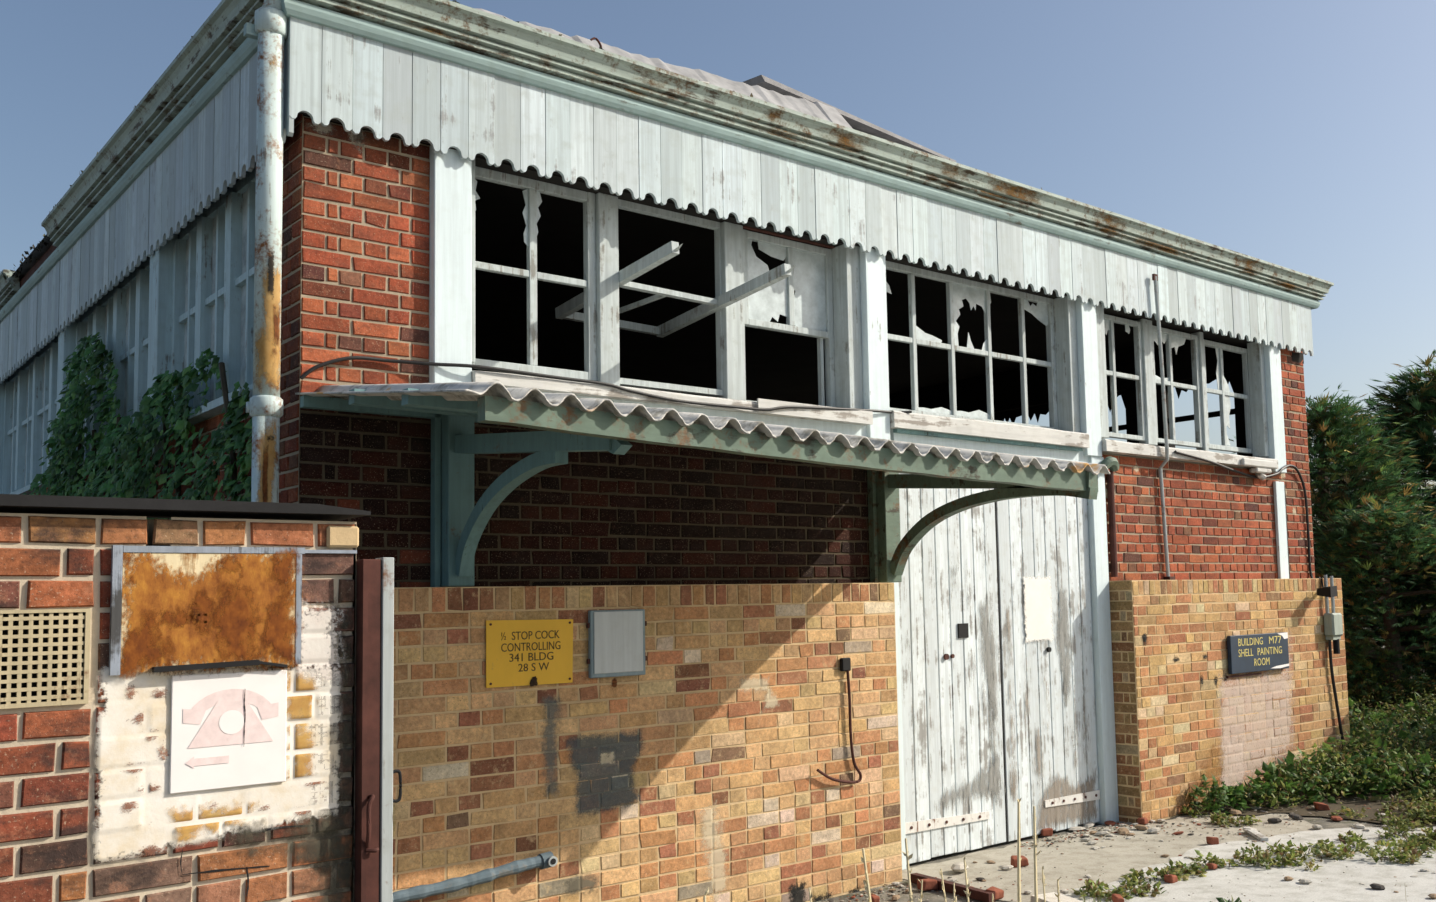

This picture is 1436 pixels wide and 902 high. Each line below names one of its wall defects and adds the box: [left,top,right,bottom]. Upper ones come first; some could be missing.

rust [255,251,281,389]
rust [257,422,276,502]
rust [120,550,303,677]
peeling [95,602,343,861]
damp [542,697,559,794]
peeling [942,568,1096,836]